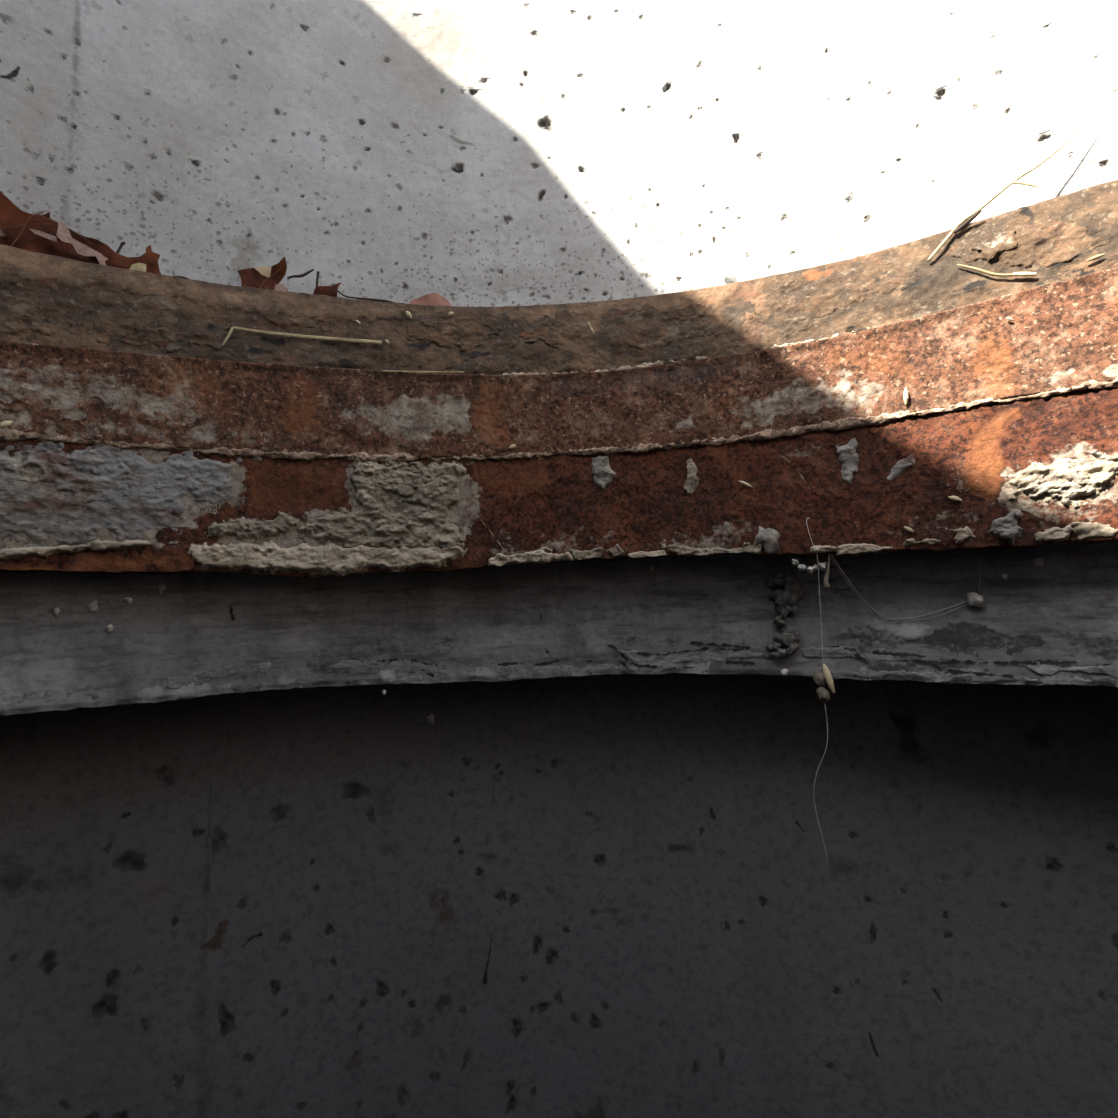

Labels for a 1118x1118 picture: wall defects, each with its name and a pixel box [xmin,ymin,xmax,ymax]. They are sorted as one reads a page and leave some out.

rust [802,256,861,283]
peeling [3,447,137,507]
rust [242,457,353,520]
rust [467,375,564,505]
rust [701,444,765,513]
rust [957,332,1027,505]
peeling [1018,465,1098,509]
peeling [1089,450,1118,461]
peeling [0,539,151,560]
rust [0,539,197,573]
peeling [188,540,467,578]
peeling [800,645,1118,687]